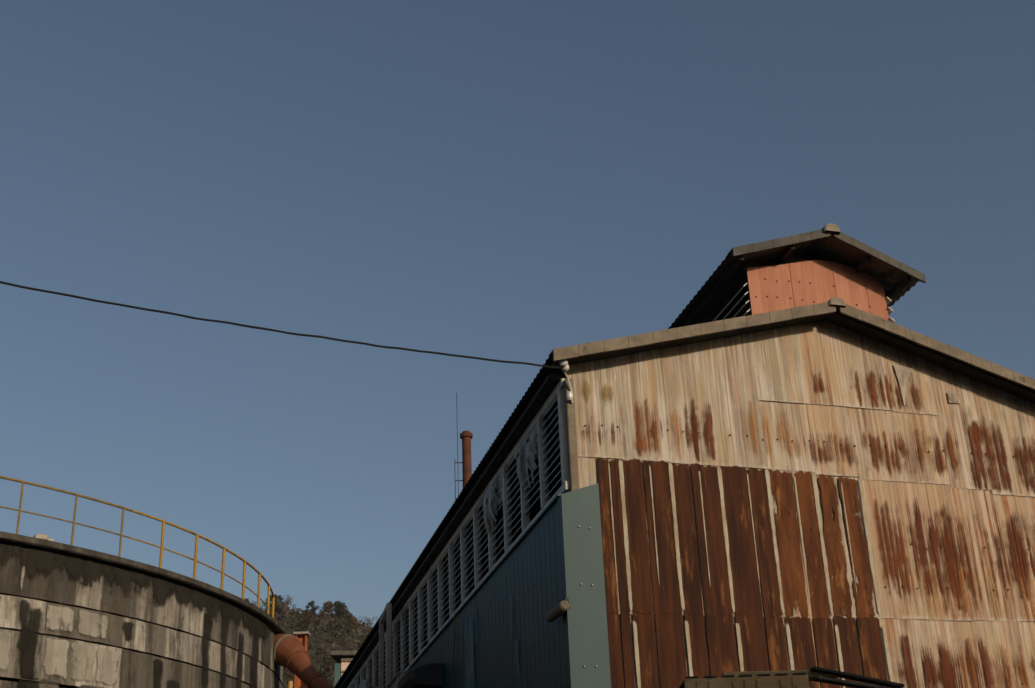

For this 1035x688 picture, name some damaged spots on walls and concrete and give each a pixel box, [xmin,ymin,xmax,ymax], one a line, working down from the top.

corrosion [814,373,829,395]
corrosion [851,371,923,411]
corrosion [581,398,1035,688]
damp [0,544,269,688]